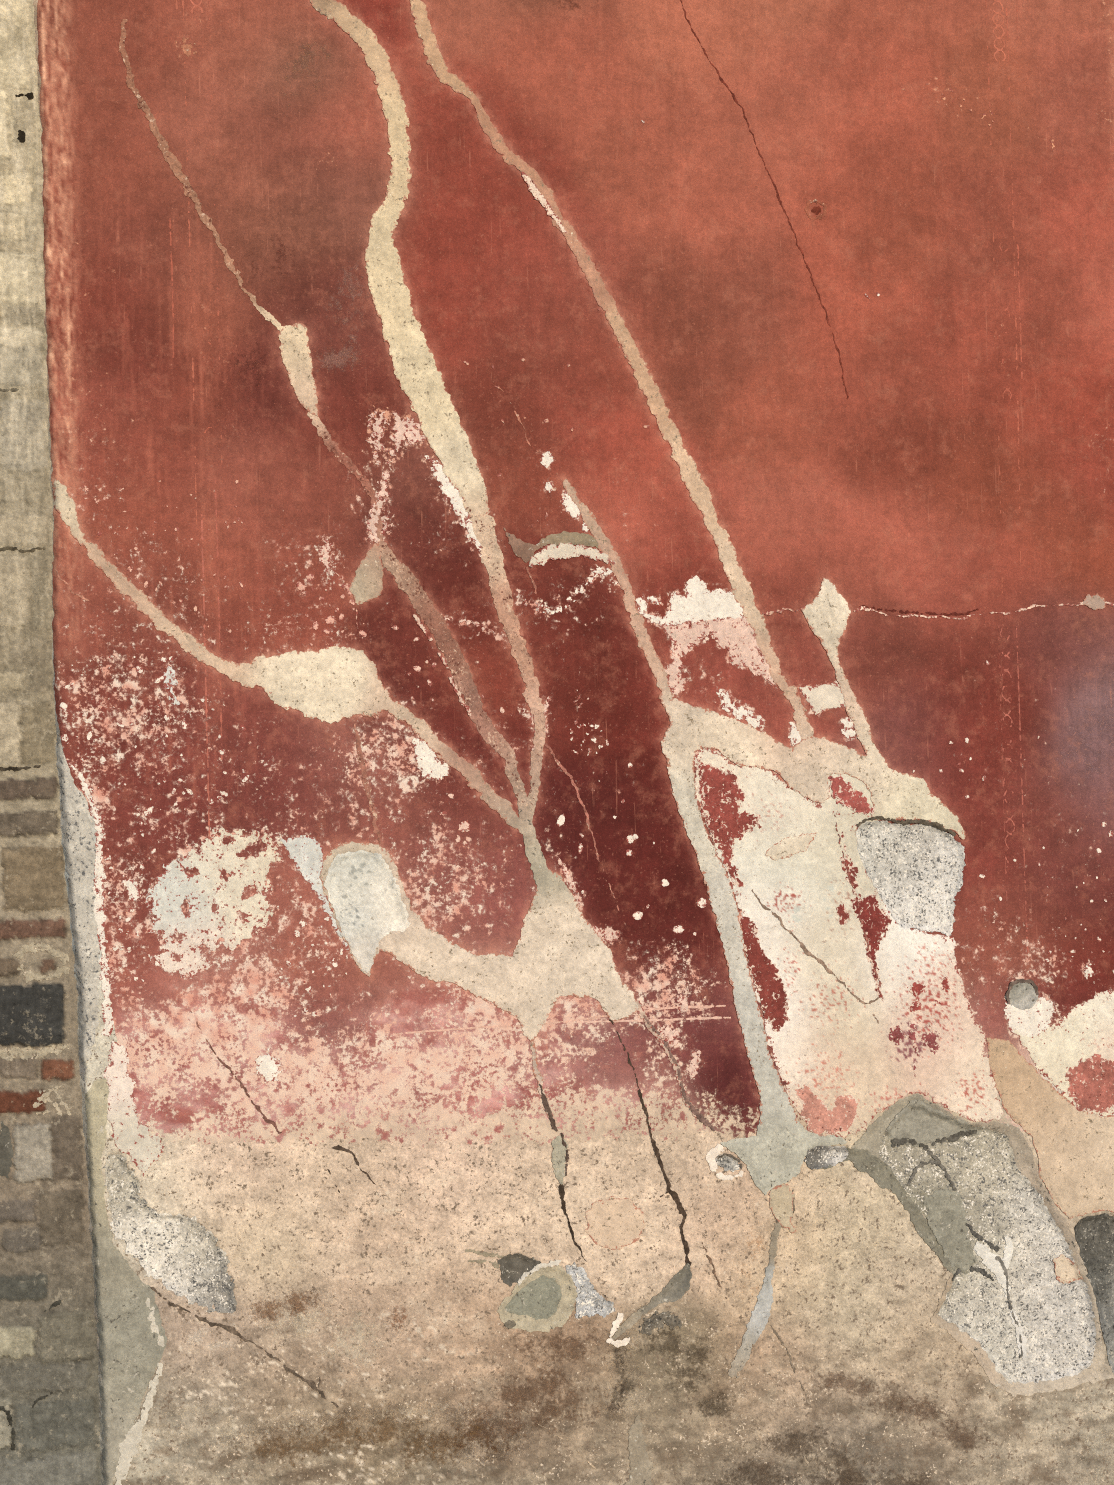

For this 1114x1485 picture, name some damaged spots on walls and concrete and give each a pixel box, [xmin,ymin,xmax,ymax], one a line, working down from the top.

flaking render [15,0,44,216]
crack [680,0,849,399]
peeling [296,539,367,651]
crack [0,0,814,911]
peeling [365,411,482,557]
peeling [532,451,589,533]
peeling [516,566,618,614]
peeling [636,575,776,695]
crack [854,593,1114,620]
flaking render [0,643,1114,1485]
crack [530,1040,586,1261]
crack [609,1000,727,1299]